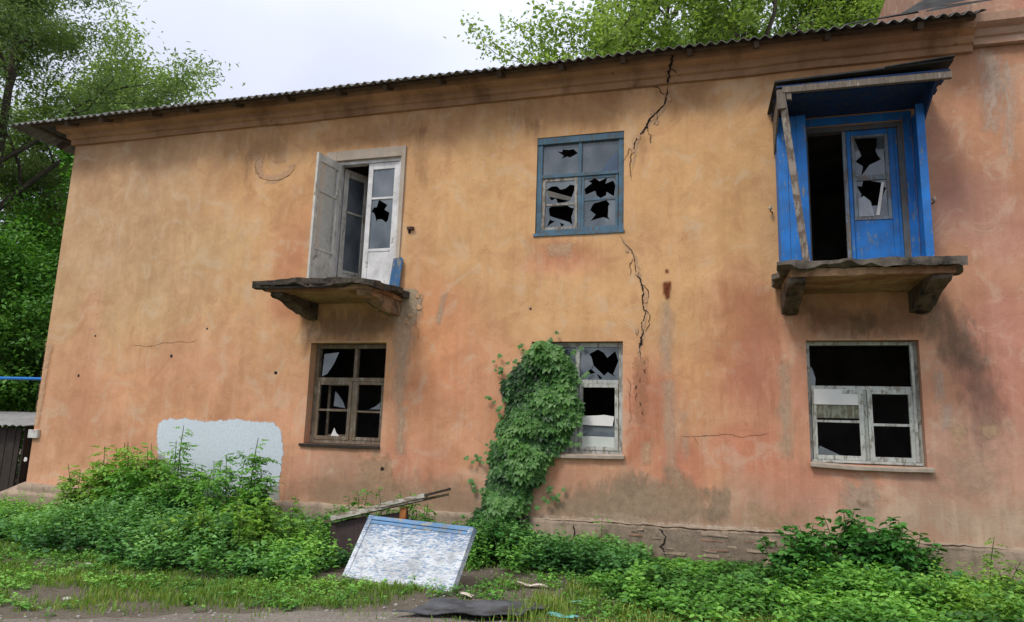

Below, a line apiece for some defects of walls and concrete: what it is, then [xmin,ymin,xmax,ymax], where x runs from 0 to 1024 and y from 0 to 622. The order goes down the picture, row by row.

crack [622,55,677,180]
crack [620,236,650,422]
peeling [553,469,777,563]